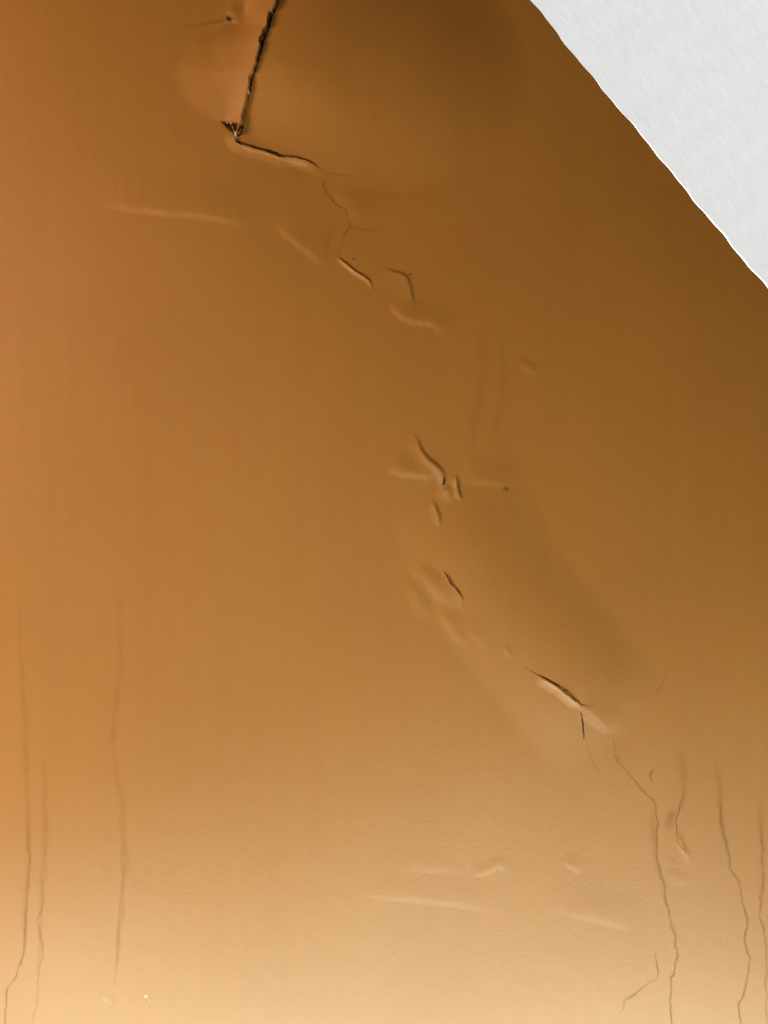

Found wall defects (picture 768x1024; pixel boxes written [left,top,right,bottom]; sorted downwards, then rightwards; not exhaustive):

crack [172,0,418,178]
crack [379,266,415,300]
crack [532,673,631,737]